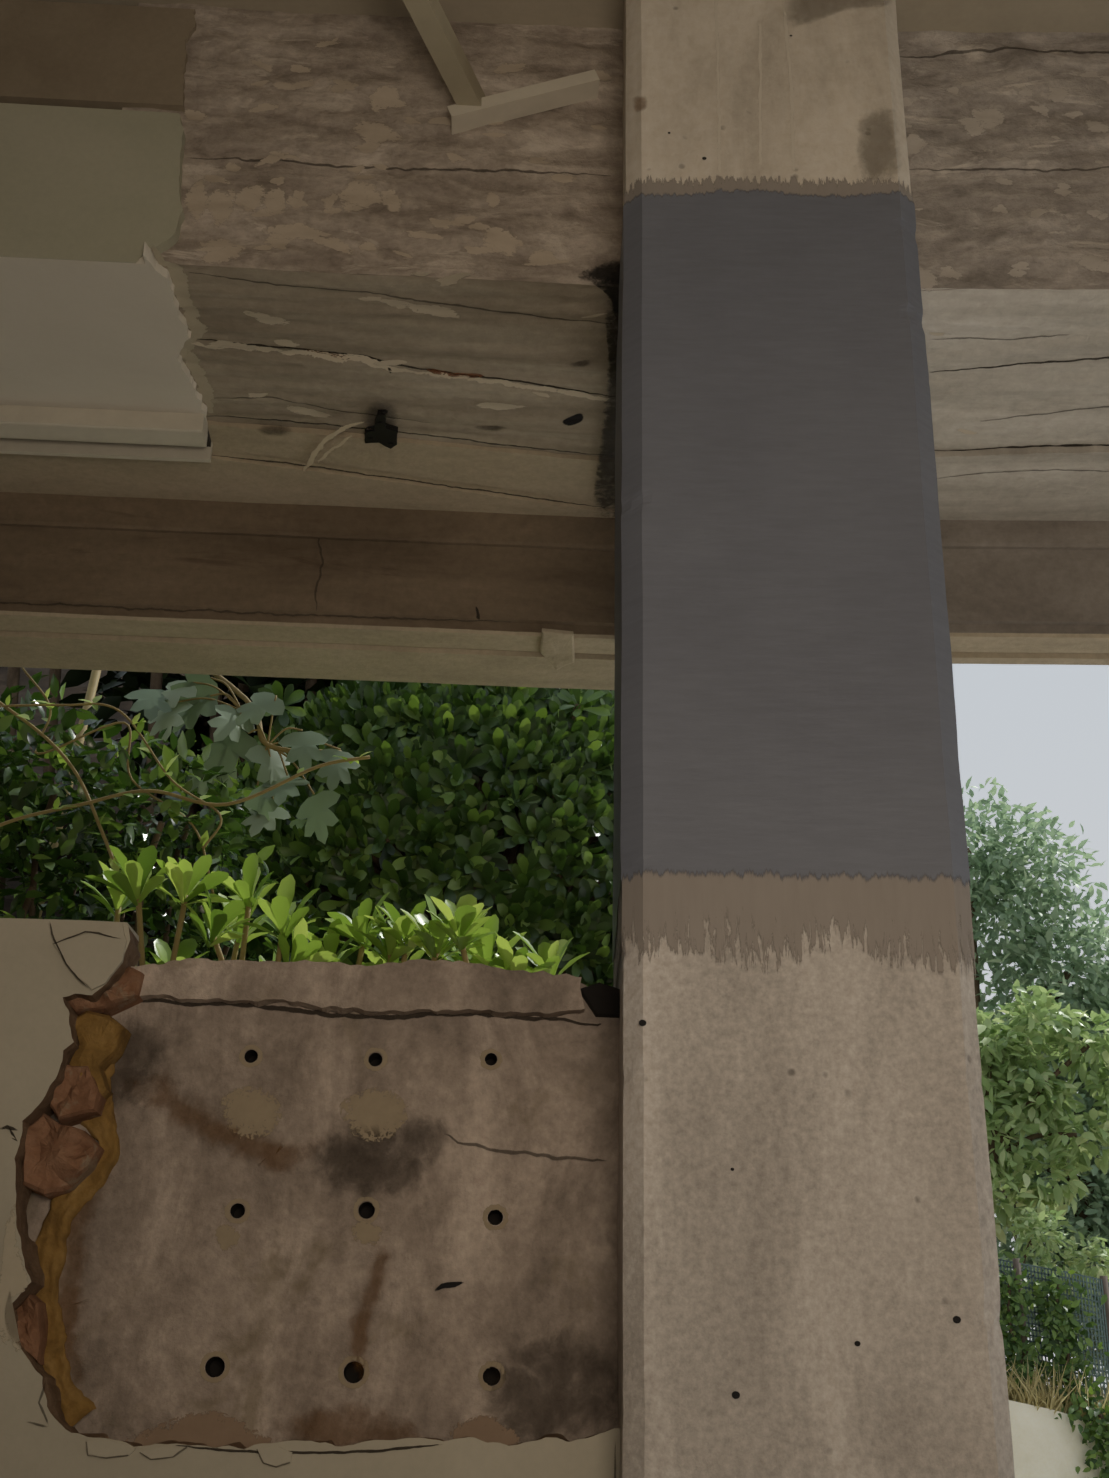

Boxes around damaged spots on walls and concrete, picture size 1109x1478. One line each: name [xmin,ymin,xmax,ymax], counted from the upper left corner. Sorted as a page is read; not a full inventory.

crack [900,47,1109,58]
crack [932,335,1109,373]
crack [935,406,1109,479]
crack [143,998,601,1026]
water stain [221,1086,282,1140]
water stain [339,1087,408,1142]
crack [448,1135,603,1162]
spalling [0,923,620,1460]